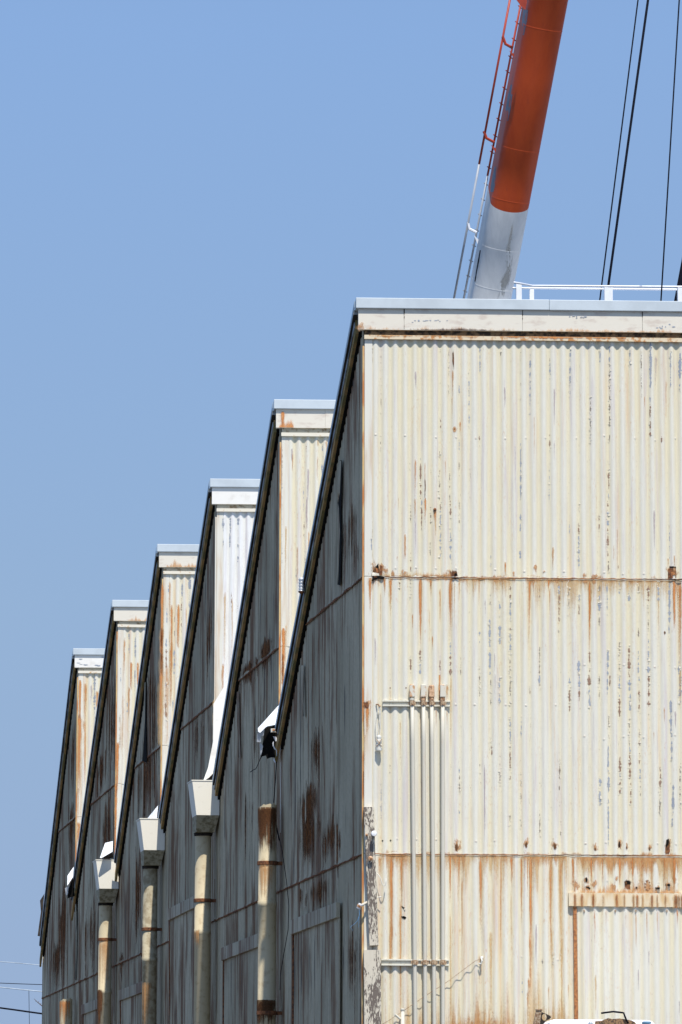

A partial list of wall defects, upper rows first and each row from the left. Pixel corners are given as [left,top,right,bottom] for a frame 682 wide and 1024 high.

corrosion [501,329,629,339]
corrosion [305,564,681,644]
corrosion [69,677,119,845]
corrosion [124,584,180,817]
corrosion [58,803,80,867]
corrosion [245,798,277,850]
corrosion [260,783,362,908]
corrosion [375,839,682,1024]